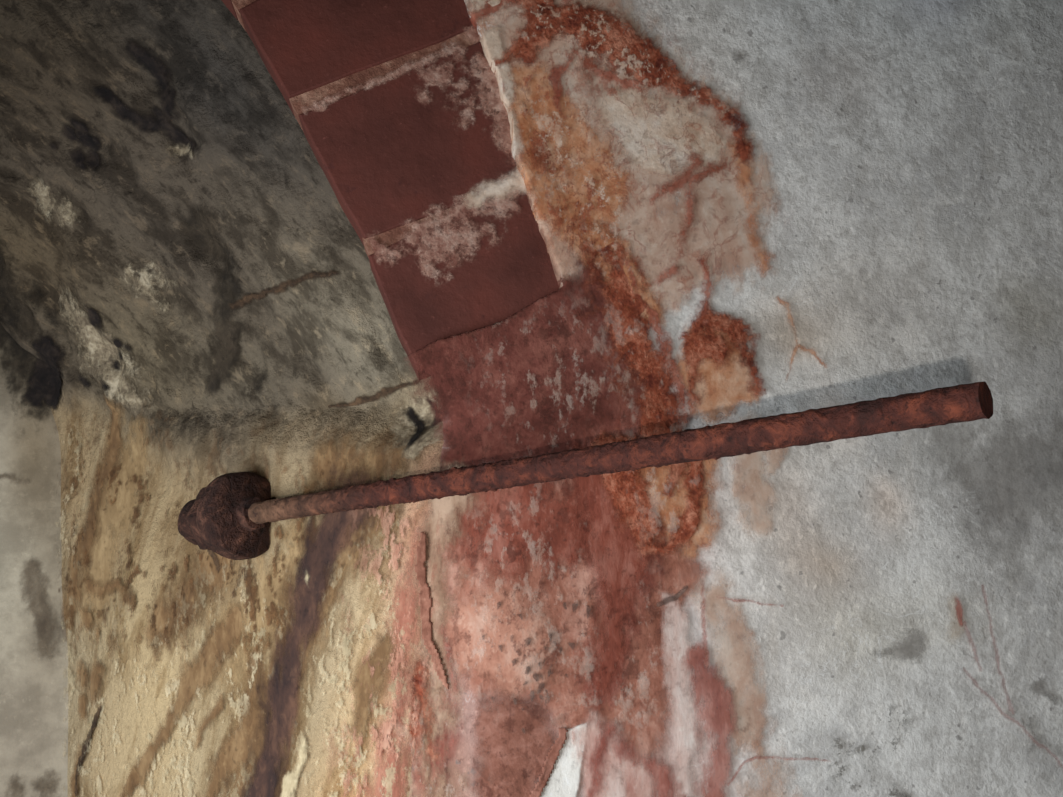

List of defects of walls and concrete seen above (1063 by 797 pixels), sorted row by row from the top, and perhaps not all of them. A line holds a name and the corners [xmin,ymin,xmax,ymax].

flaking render [464,0,501,14]
flaking render [480,27,523,158]
damp [0,248,65,419]
damp [176,209,249,393]
crack [230,271,339,309]
corrosion [470,0,773,446]
crack [778,297,825,369]
corrosion [602,459,718,557]
damp [97,504,403,797]
corrosion [346,494,473,797]
peeling [474,634,652,797]
crack [1030,681,1057,704]